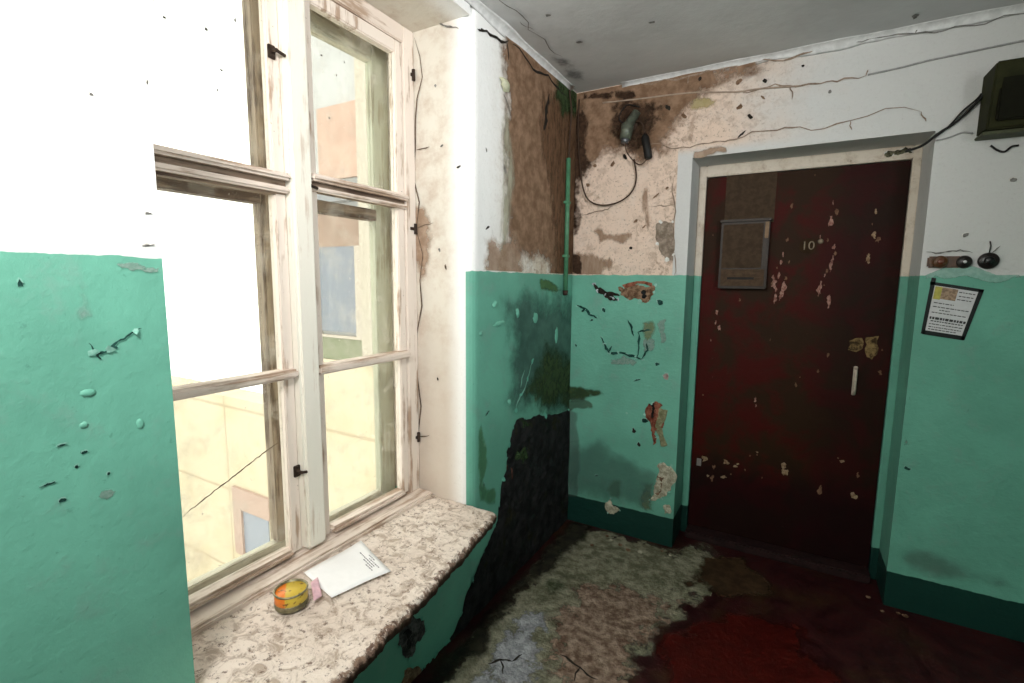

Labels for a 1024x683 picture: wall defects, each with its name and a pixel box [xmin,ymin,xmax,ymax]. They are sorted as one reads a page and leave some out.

crack [859,13,1024,42]
crack [640,51,868,98]
crack [641,107,926,149]
flaking render [634,219,675,262]
flaking render [617,281,663,305]
crack [576,283,650,361]
water stain [507,295,572,401]
flaking render [632,401,668,447]
flaking render [398,358,570,683]
flaking render [605,497,621,514]
flaking render [649,462,677,514]